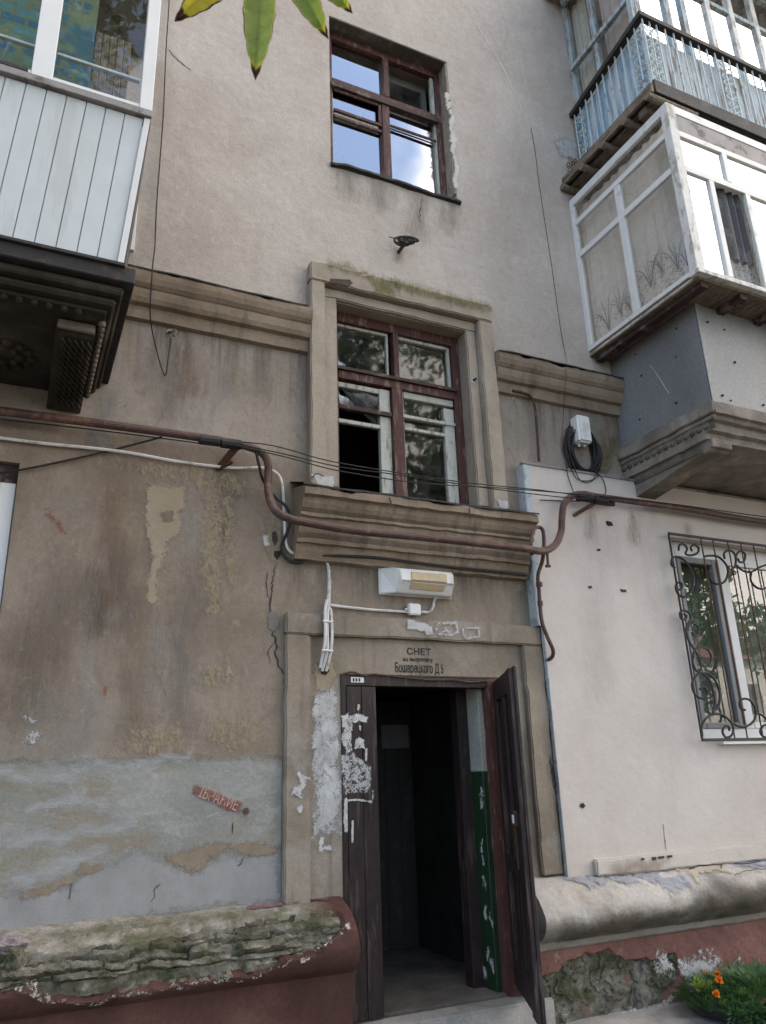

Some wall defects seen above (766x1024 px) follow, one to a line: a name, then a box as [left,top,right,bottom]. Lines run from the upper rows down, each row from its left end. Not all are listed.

spalling [444,92,460,188]
leakage [329,262,489,309]
peeling [136,459,251,618]
crack [266,562,284,692]
peeling [291,661,343,852]
spalling [165,840,282,873]
peeling [562,855,766,899]
spalling [0,897,350,1007]
spalling [543,948,740,1024]